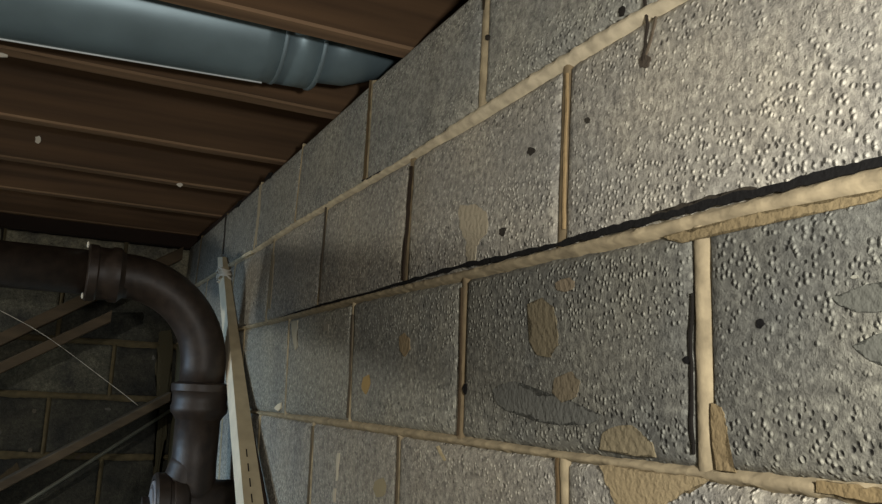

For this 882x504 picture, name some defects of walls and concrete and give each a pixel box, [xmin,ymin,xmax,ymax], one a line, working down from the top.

crack [640,0,658,61]
crack [265,156,882,455]
damp [833,275,882,313]
damp [853,333,882,365]